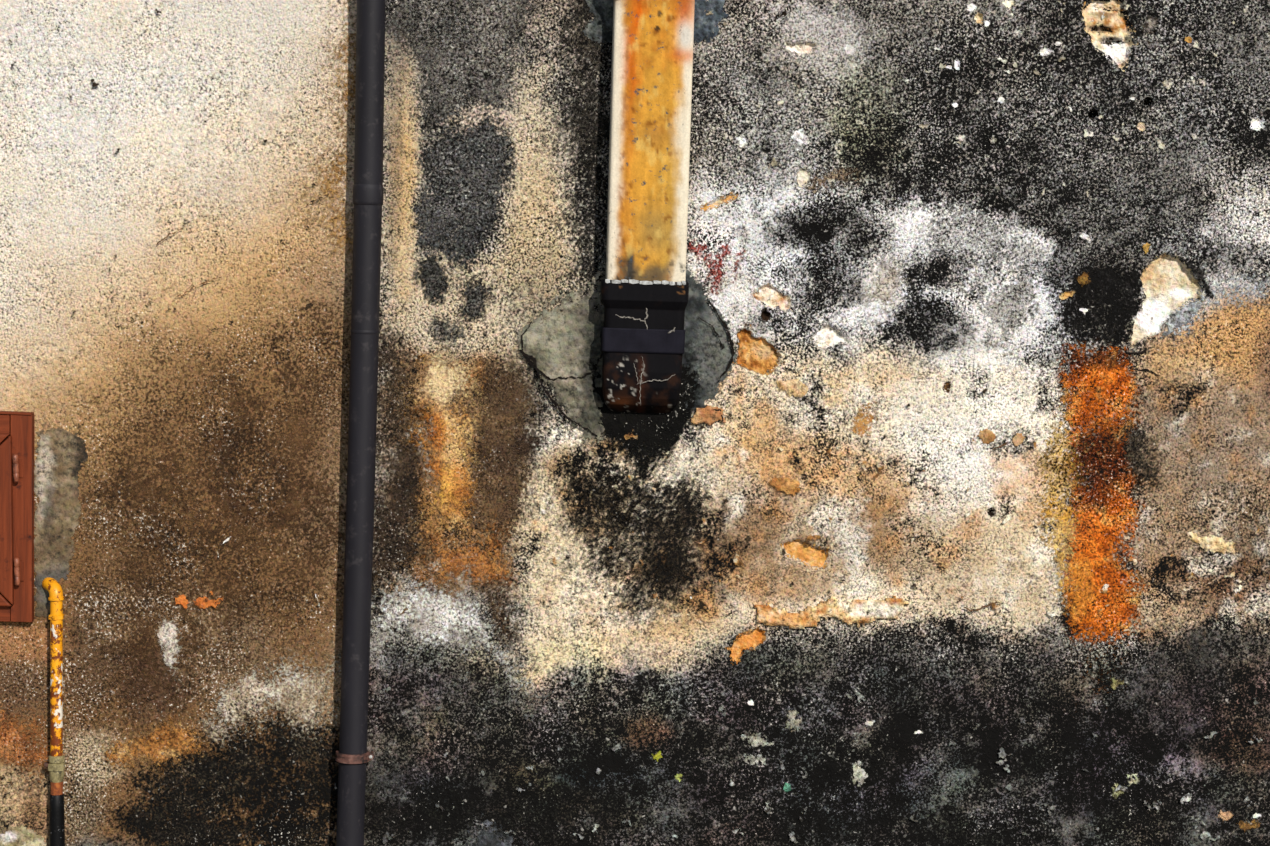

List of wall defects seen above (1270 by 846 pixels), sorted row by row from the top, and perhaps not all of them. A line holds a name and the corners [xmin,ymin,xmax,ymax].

flaking render [1081,0,1160,72]
leakage [385,0,540,348]
leakage [918,204,1048,339]
flaking render [1059,272,1091,315]
flaking render [1130,243,1214,348]
leakage [81,293,352,846]
rust [407,350,517,588]
leakage [558,359,714,620]
flaking render [781,539,853,570]
peeling [725,592,909,663]
rust [1032,344,1163,692]
rust [0,703,64,782]